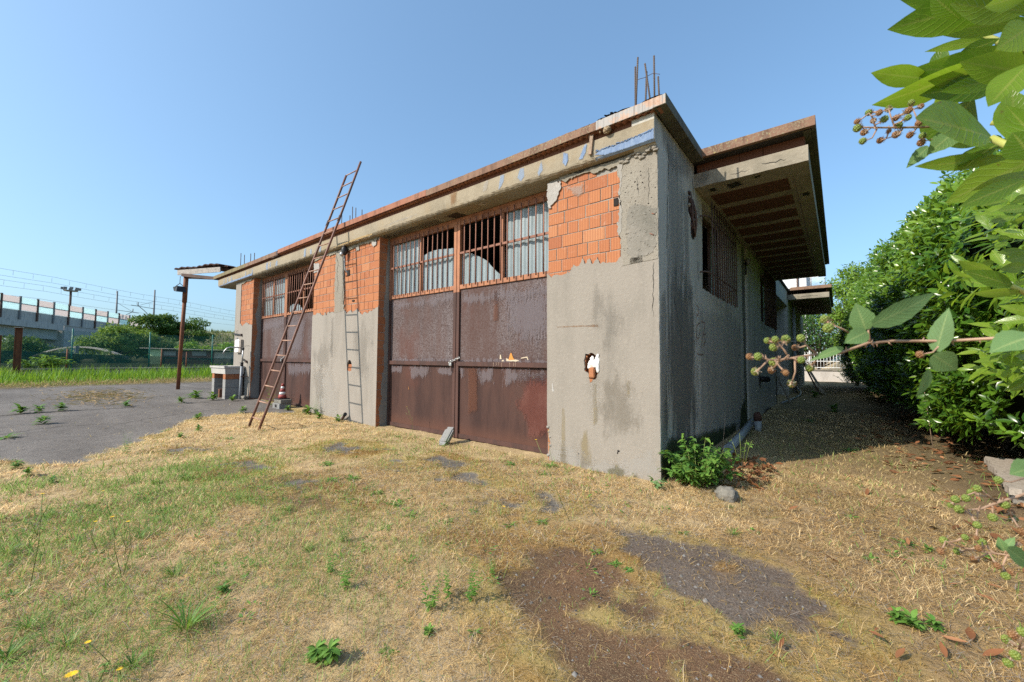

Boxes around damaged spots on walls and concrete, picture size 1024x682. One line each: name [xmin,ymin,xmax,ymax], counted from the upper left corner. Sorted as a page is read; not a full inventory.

flaking render [538,128,658,277]
flaking render [221,253,277,326]
flaking render [304,233,380,315]
spalling [585,353,600,382]
corrosion [519,377,548,436]